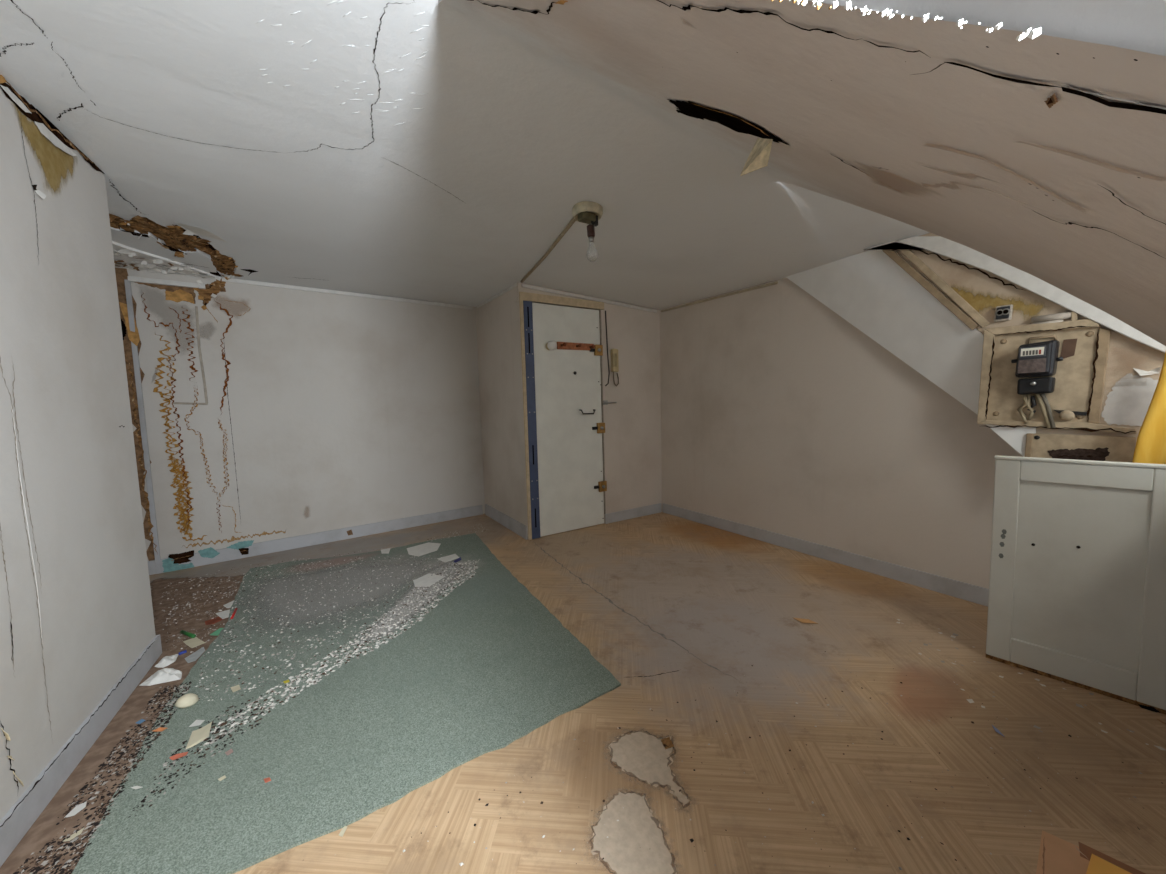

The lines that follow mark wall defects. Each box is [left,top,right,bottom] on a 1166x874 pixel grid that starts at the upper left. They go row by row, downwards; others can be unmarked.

crack [0,0,462,201]
spalling [771,0,943,22]
crack [657,0,1166,114]
spalling [956,19,1002,33]
spalling [1016,28,1041,41]
spalling [109,214,242,310]
crack [1024,206,1166,259]
crack [1101,186,1166,225]
crack [0,526,14,674]
peeling [0,540,254,874]